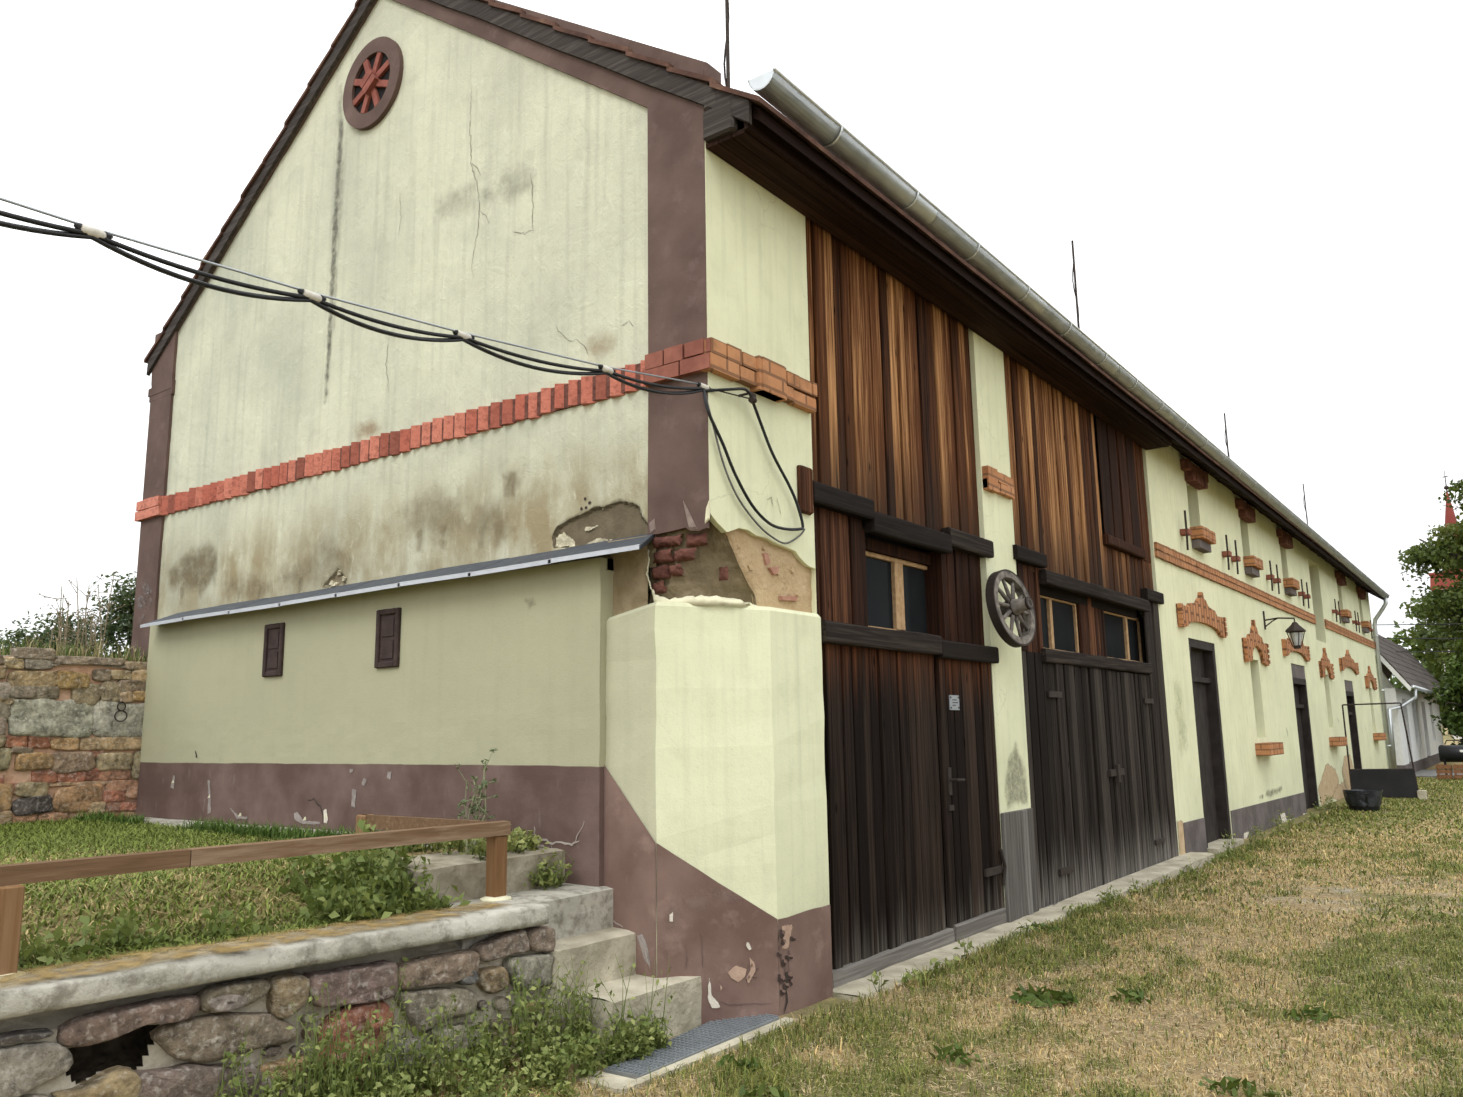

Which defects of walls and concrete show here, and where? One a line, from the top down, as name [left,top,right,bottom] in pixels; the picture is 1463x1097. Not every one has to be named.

leakage [326,122,342,394]
leakage [170,549,216,586]
flaking render [552,497,812,616]
peeling [708,942,759,1008]
peeling [777,924,796,1014]